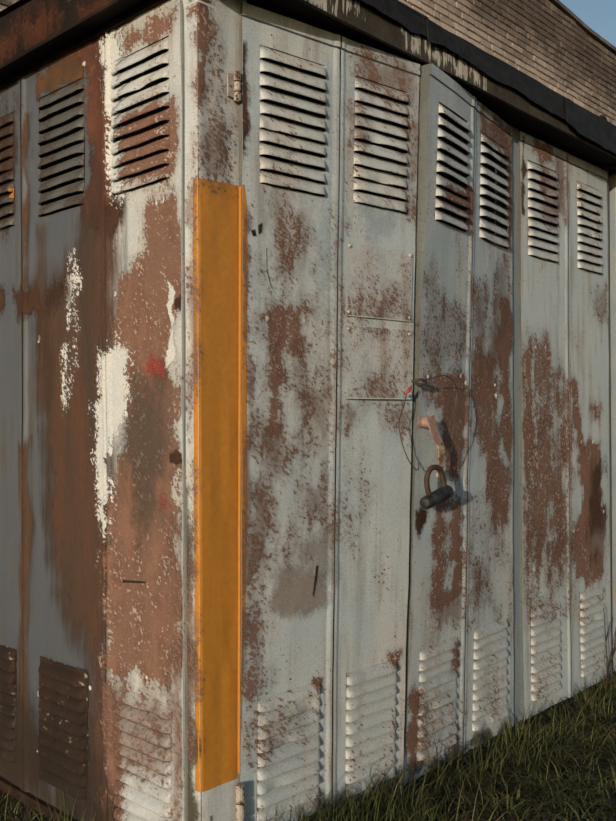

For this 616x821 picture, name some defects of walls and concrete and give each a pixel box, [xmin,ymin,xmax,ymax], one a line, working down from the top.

peeling [305,0,359,17]
peeling [401,25,487,91]
peeling [59,248,83,416]
peeling [88,326,135,542]
corrosion [0,0,251,821]
corrosion [241,186,411,773]
corrosion [415,105,606,632]
corrosion [405,683,467,771]
corrosion [451,642,460,678]